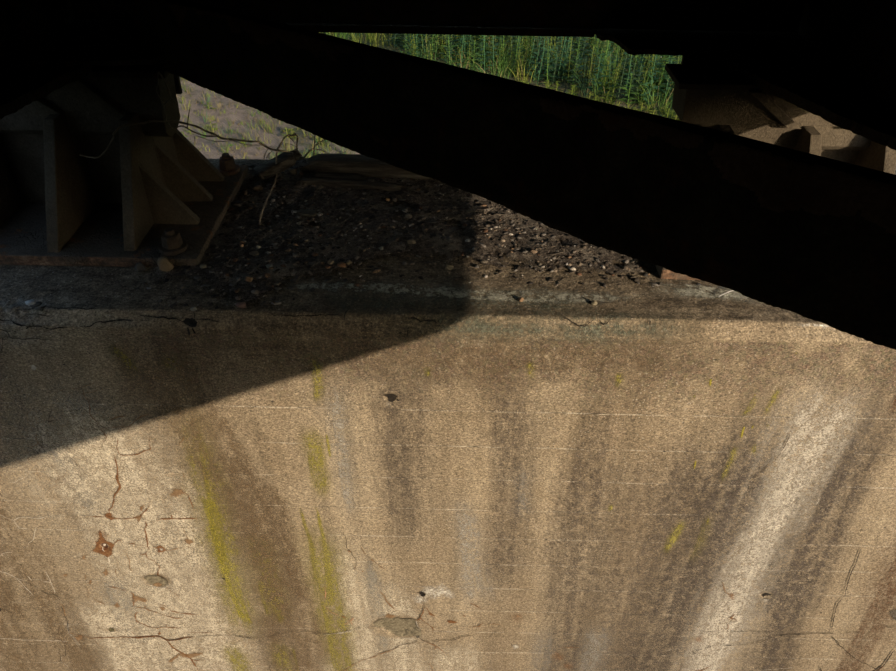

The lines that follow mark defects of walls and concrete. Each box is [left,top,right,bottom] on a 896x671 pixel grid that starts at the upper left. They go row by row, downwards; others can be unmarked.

corrosion [82,530,121,576]
crack [0,383,375,671]
damp [0,346,478,671]
crack [344,608,511,671]
damp [492,399,527,573]
crack [681,549,895,671]